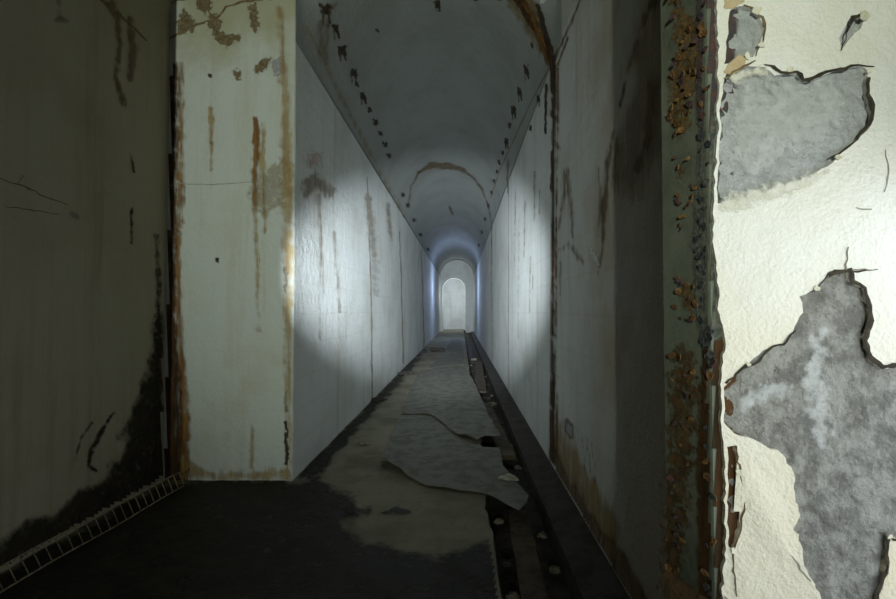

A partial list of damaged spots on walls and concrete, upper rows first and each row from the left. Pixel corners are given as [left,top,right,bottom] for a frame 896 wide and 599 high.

corrosion [164,63,190,480]
spalling [176,0,241,46]
crack [170,0,262,39]
spalling [247,2,260,33]
corrosion [252,117,266,218]
peeling [253,56,285,76]
corrosion [401,63,529,247]
corrosion [500,0,579,464]
corrosion [667,0,699,138]
spalling [693,0,896,599]
damp [0,251,498,599]
corrosion [659,342,699,576]